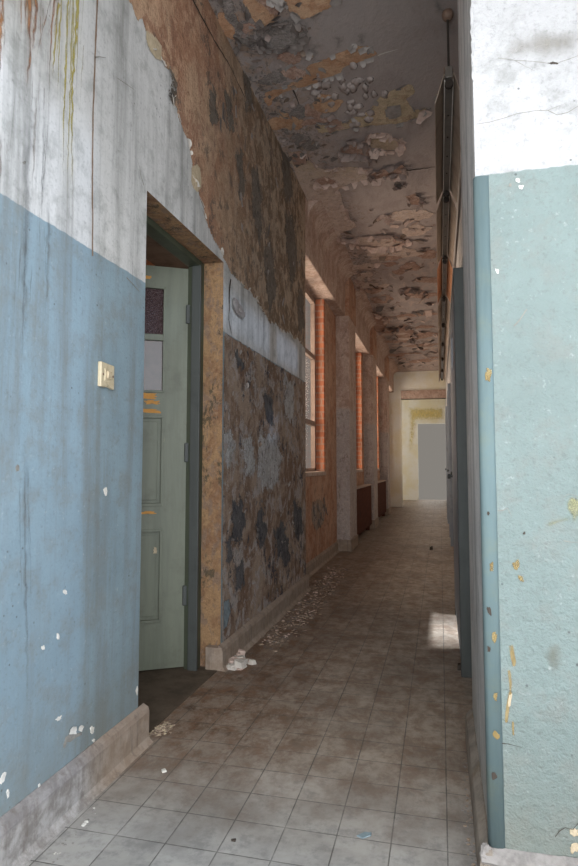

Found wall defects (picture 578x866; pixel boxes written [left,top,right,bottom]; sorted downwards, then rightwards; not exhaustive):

rust [21,0,59,66]
leakage [53,0,84,144]
crack [500,56,576,70]
crack [479,106,578,124]
peeling [129,0,438,368]
peeling [222,333,328,642]
spalling [63,725,95,748]
spalling [570,829,578,854]